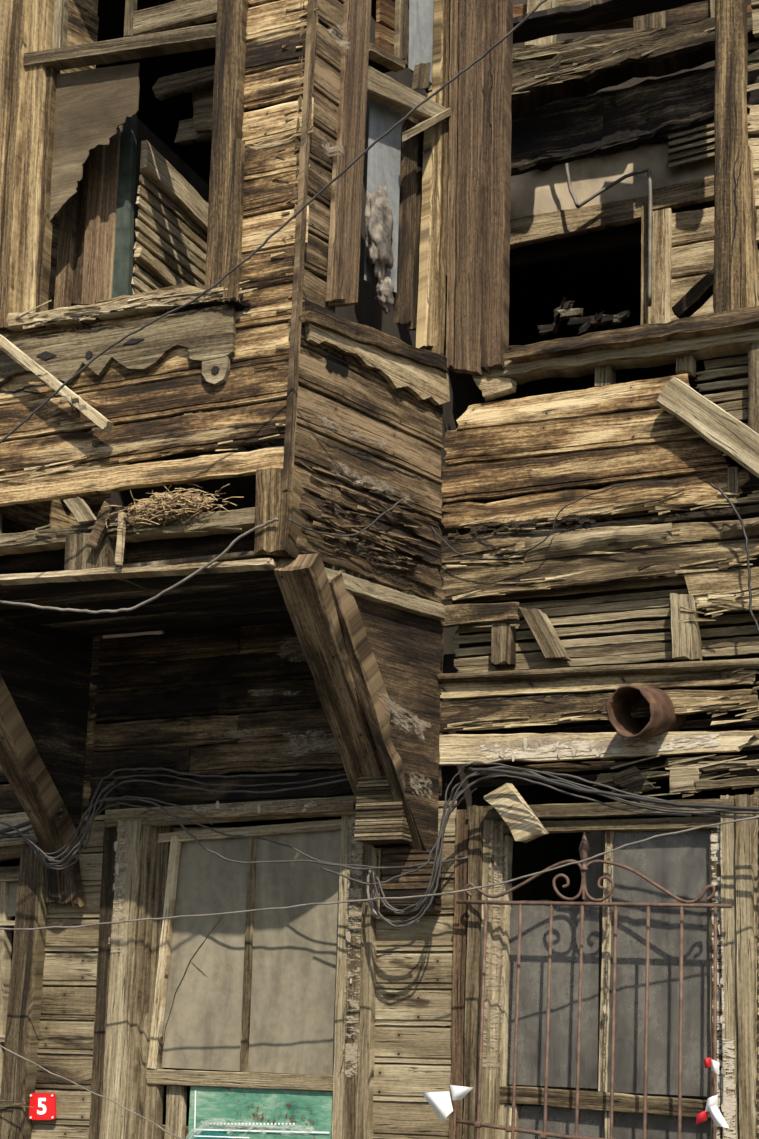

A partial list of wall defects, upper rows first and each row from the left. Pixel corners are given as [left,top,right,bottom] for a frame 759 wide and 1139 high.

peeling [342,817,364,1077]
peeling [710,826,737,1139]